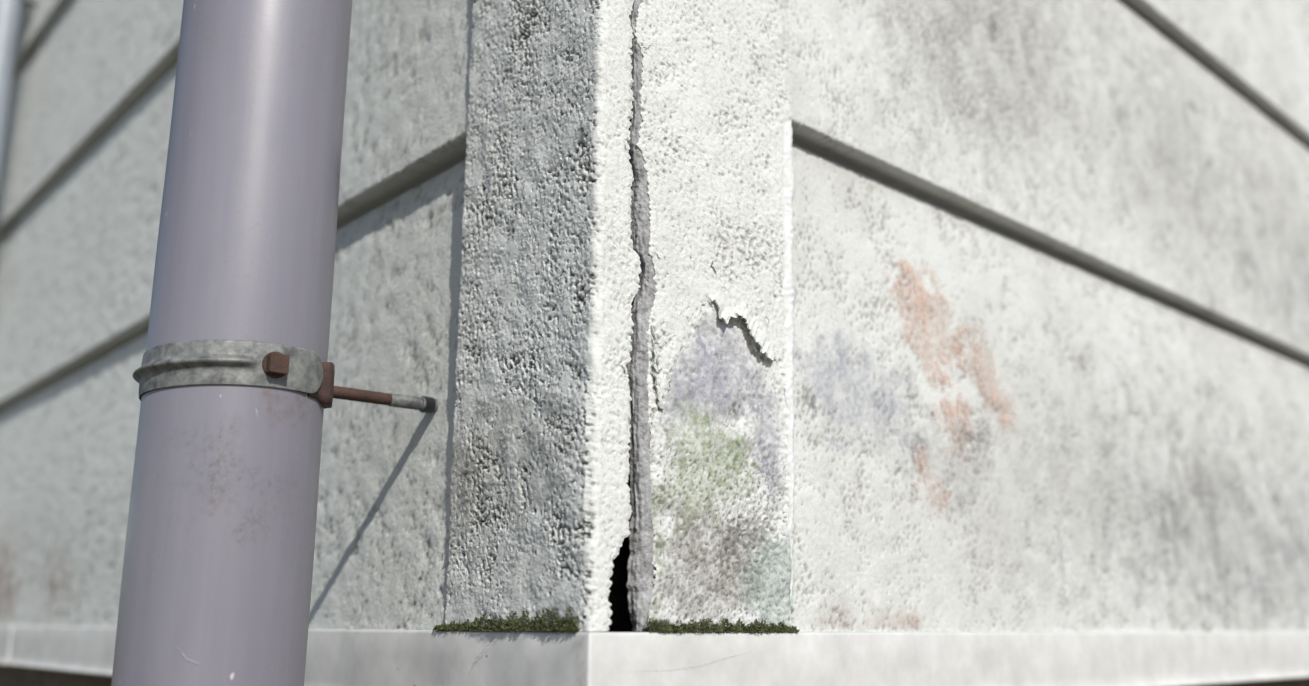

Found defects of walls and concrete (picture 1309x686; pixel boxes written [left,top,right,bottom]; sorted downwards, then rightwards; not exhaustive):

crack [608,0,659,631]
leakage [675,337,732,414]
leakage [664,511,761,607]
peeling [647,292,794,630]